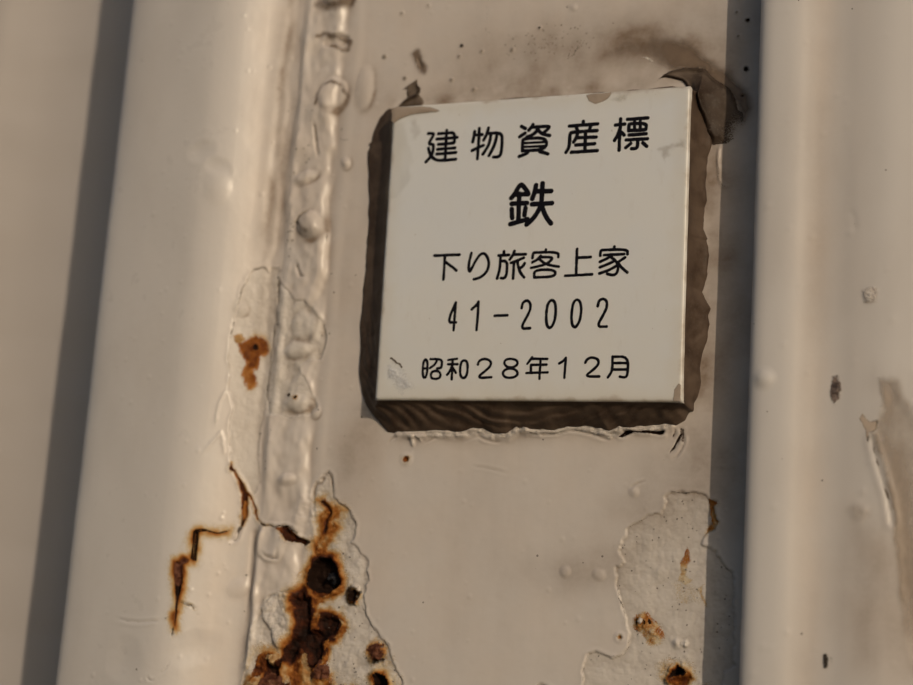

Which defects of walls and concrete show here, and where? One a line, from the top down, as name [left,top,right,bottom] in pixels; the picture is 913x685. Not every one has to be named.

rust [233,331,272,394]
peeling [242,588,297,684]
rust [242,487,404,685]
peeling [275,476,402,685]
rust [633,612,666,648]
peeling [582,491,735,685]
rust [655,657,697,685]
leakage [860,377,913,606]